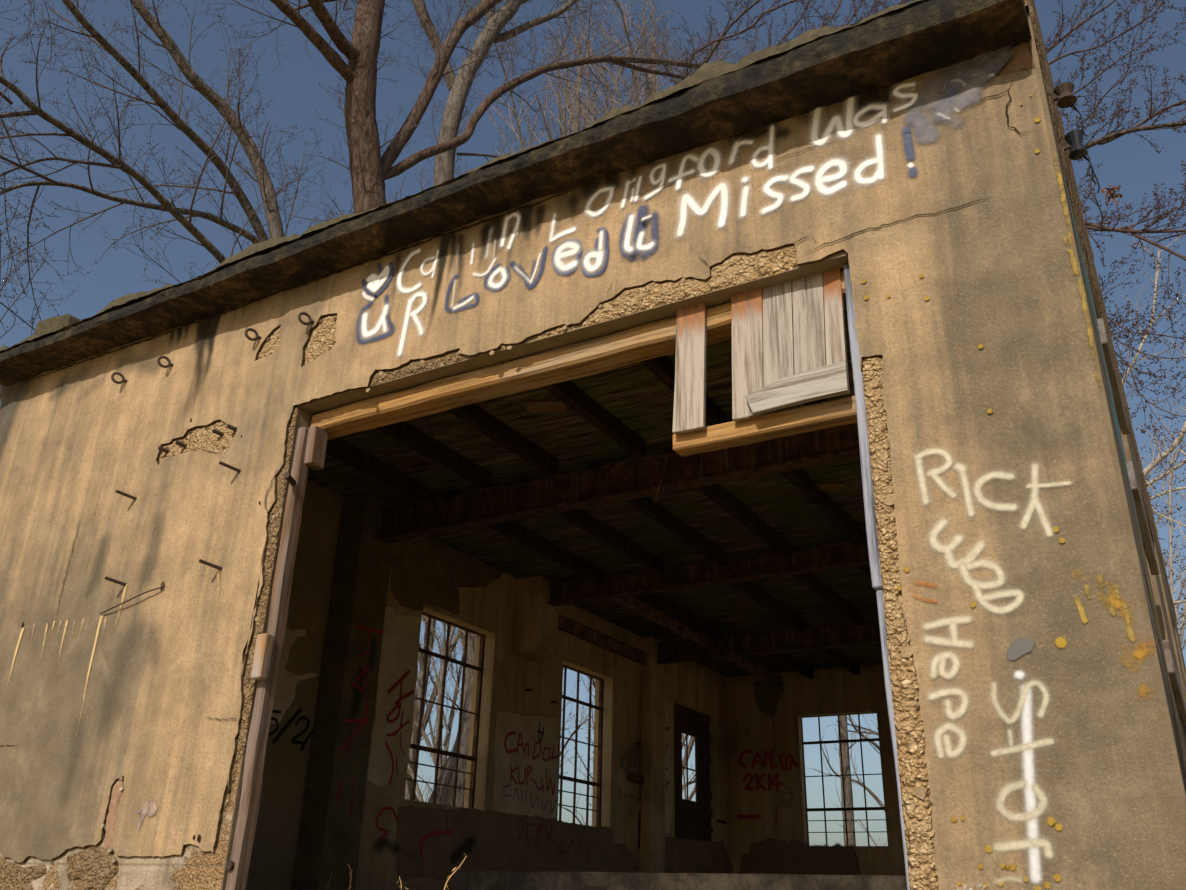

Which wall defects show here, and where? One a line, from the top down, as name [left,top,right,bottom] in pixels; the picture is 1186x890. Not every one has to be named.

crack [971,82,1026,134]
crack [797,197,990,253]
damp [170,313,220,369]
spalling [156,419,237,465]
spalling [209,243,848,853]
peeling [396,710,640,880]
spalling [0,775,133,890]